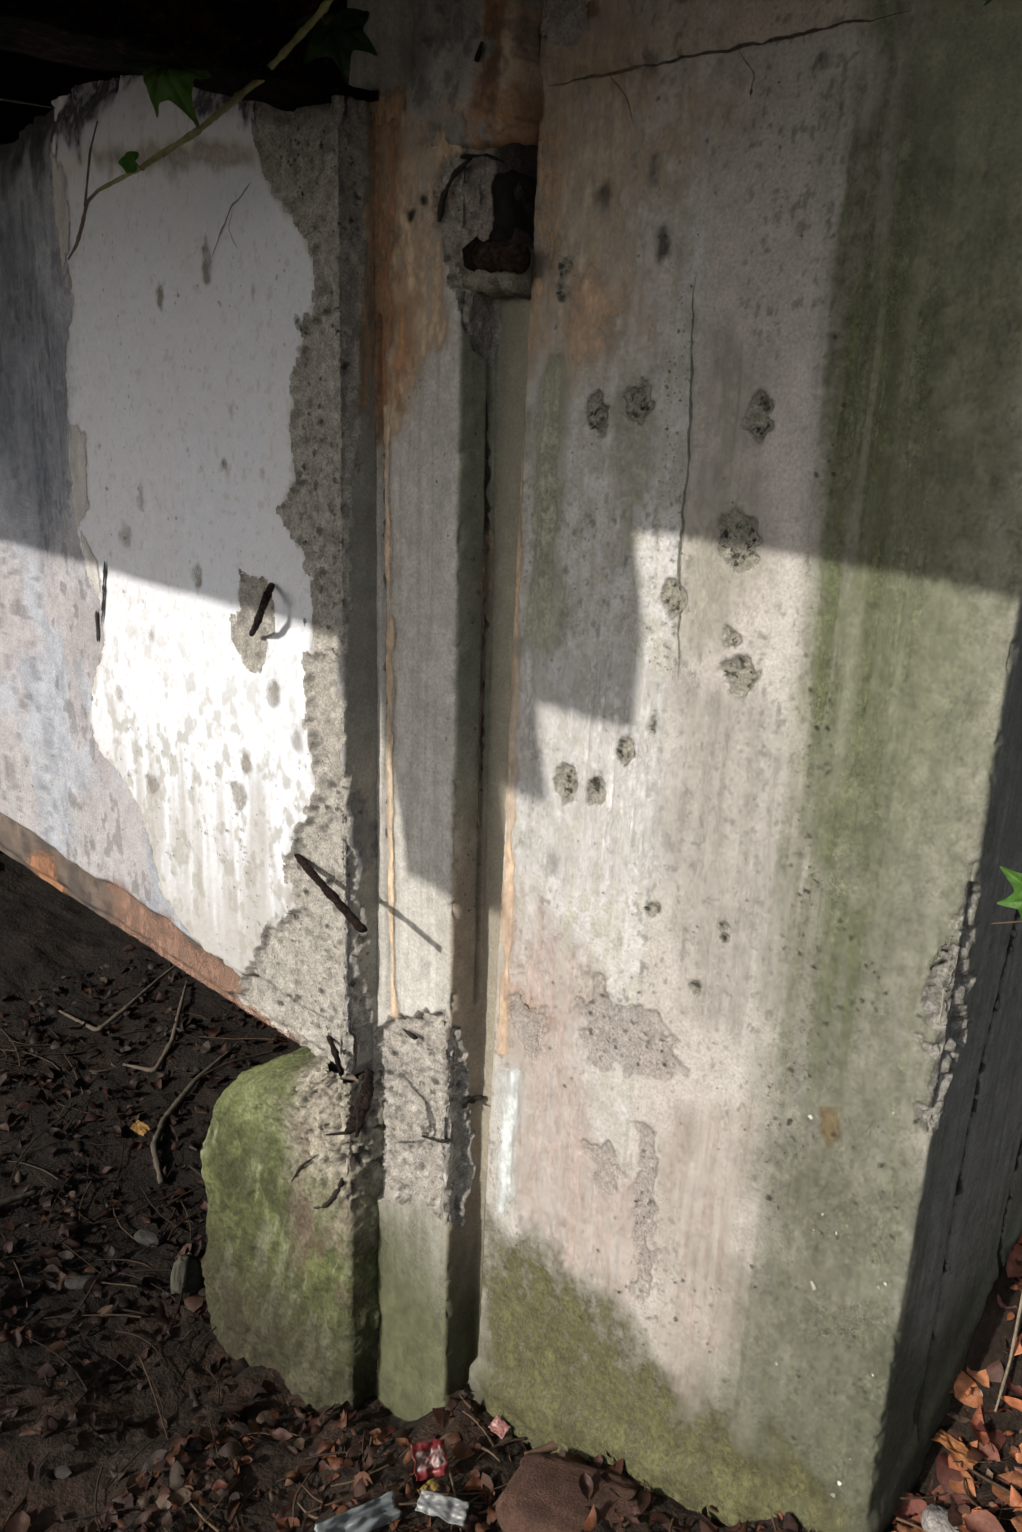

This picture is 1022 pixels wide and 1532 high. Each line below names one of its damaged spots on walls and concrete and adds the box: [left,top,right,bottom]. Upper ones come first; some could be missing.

crack [549,11,909,123]
spalling [431,143,539,335]
spalling [556,260,572,302]
spalling [229,95,476,1229]
corrosion [368,87,461,1019]
spalling [912,881,982,1136]
crack [930,910,1022,1340]